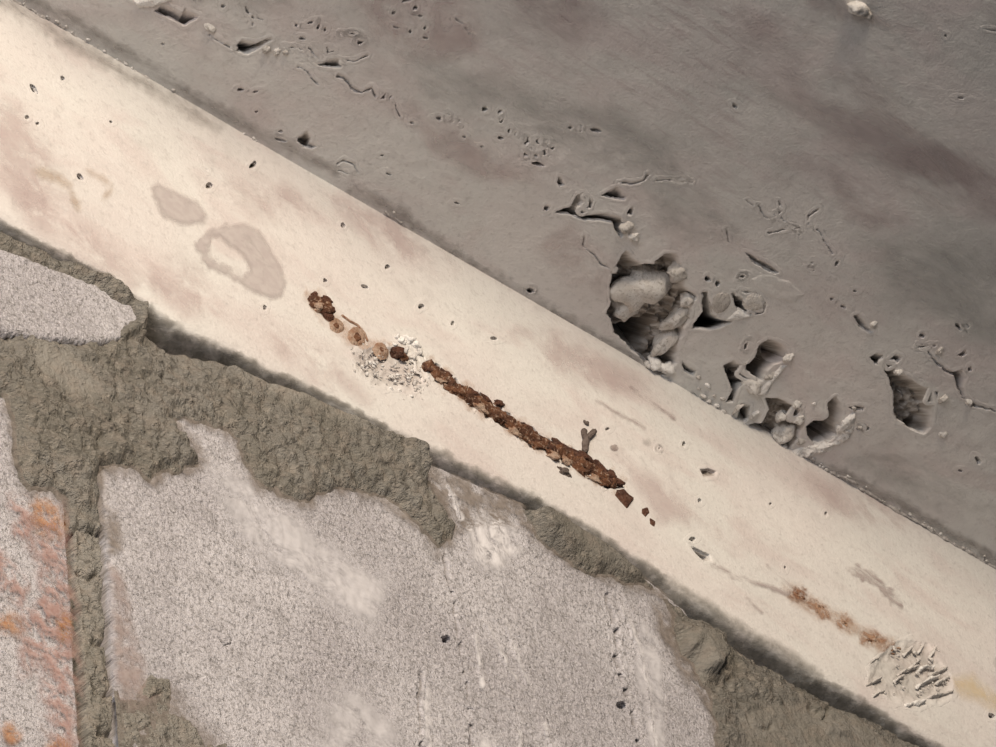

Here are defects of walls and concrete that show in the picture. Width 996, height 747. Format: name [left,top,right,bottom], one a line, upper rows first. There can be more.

spalling [134,0,204,31]
leakage [153,185,205,223]
spalling [597,182,638,223]
leakage [196,225,285,297]
spalling [701,224,805,320]
rust [306,291,389,360]
spalling [720,335,787,425]
spalling [866,349,906,371]
peeling [789,402,876,458]
rust [0,501,75,747]
rust [791,587,901,655]
spalling [865,634,958,712]